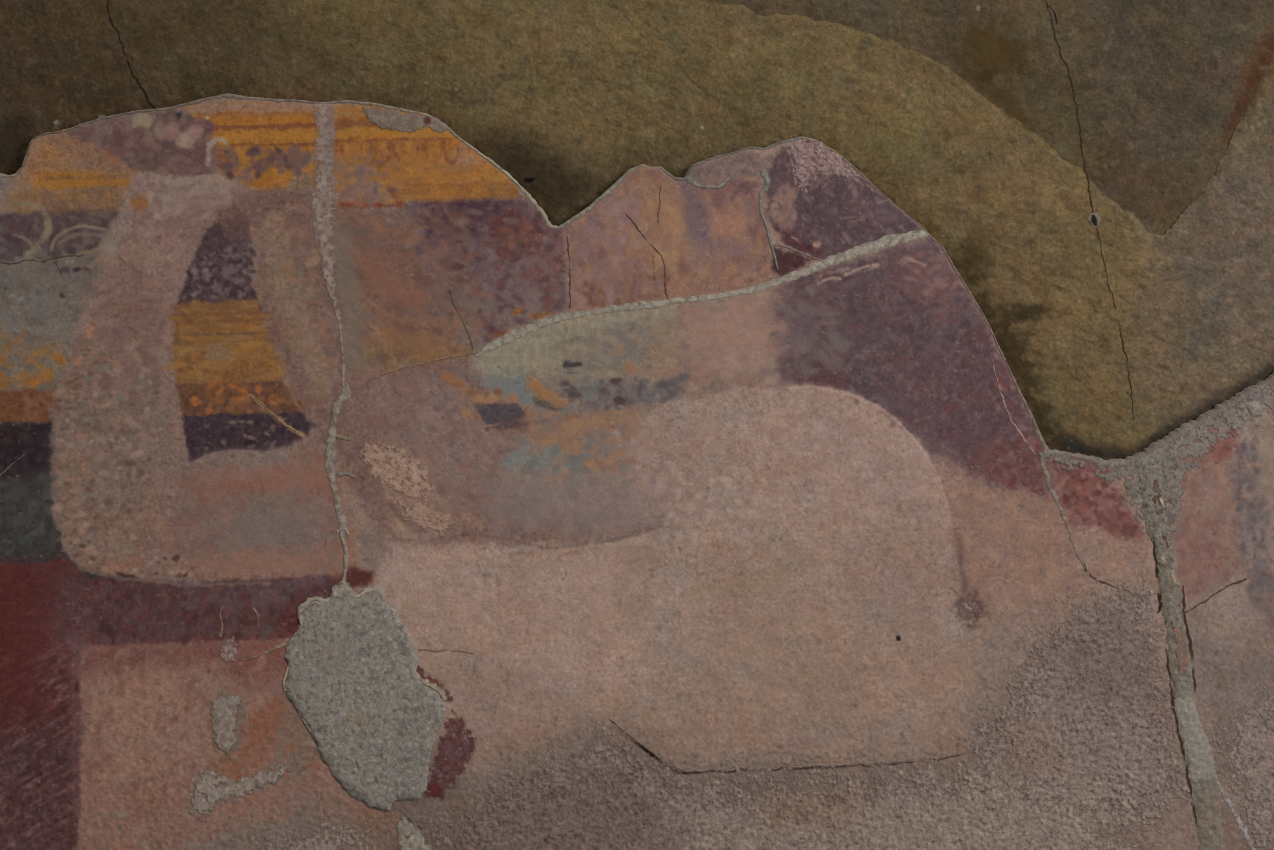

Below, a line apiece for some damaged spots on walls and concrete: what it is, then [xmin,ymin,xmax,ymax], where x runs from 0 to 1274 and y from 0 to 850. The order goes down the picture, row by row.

crack [107,0,156,109]
flaking render [364,107,451,133]
flaking render [793,140,859,193]
crack [1045,0,1134,420]
crack [311,103,928,585]
crack [1185,577,1247,613]
flaking render [210,693,242,755]
peeling [416,666,475,800]
crack [609,719,961,774]
flaking render [189,764,291,820]